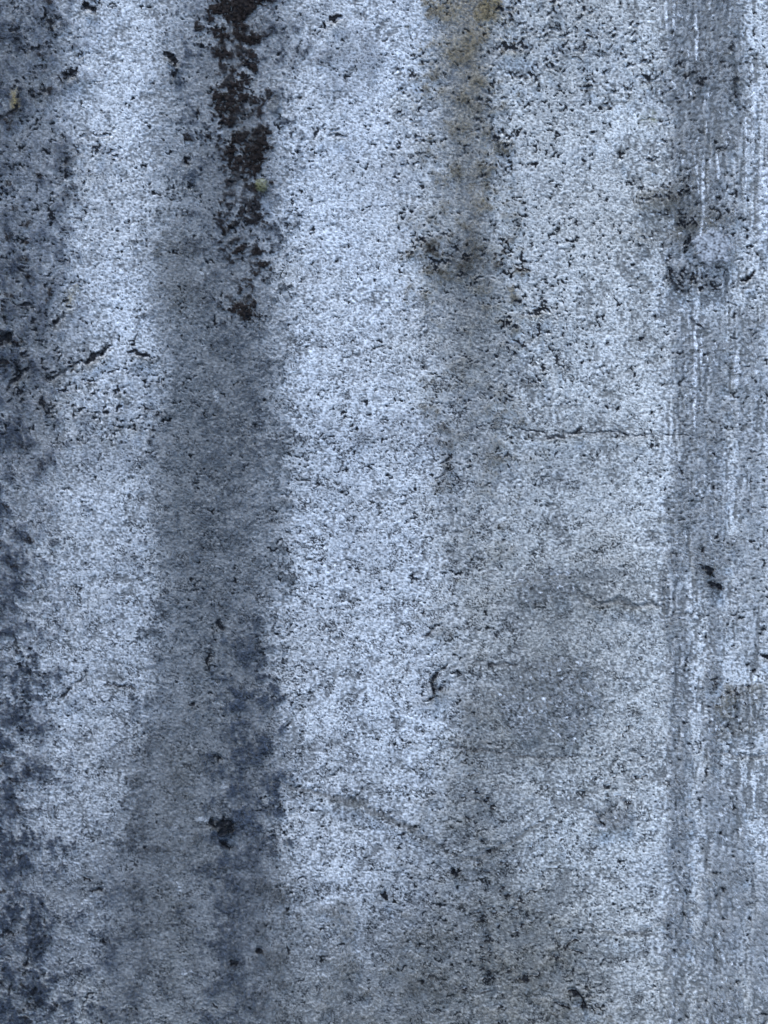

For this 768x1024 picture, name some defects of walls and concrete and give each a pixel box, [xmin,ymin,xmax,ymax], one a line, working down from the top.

leakage [397,120,529,412]
leakage [694,156,720,236]
leakage [745,64,768,252]
leakage [0,0,364,1024]
crack [511,426,689,440]
leakage [693,319,703,428]